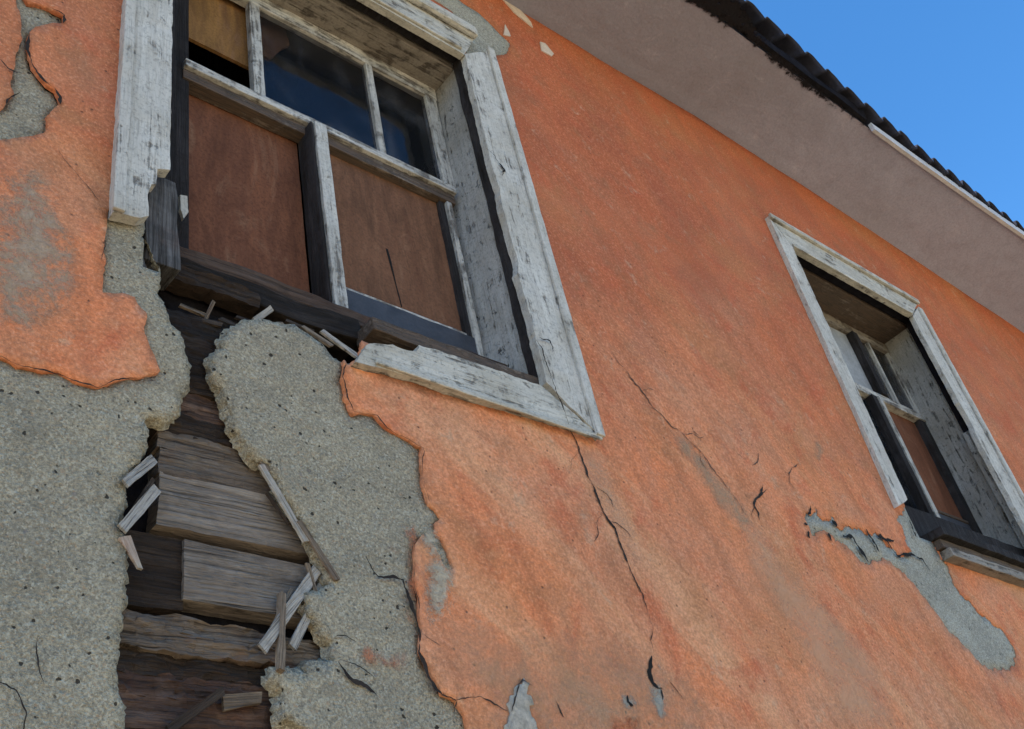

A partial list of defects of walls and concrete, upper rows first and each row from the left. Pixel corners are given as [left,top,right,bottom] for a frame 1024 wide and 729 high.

flaking render [0,0,66,140]
peeling [178,195,189,221]
flaking render [0,210,464,729]
crack [366,557,507,725]
flaking render [504,678,537,729]
crack [537,337,683,717]
crack [613,354,929,569]
flaking render [804,507,1016,671]